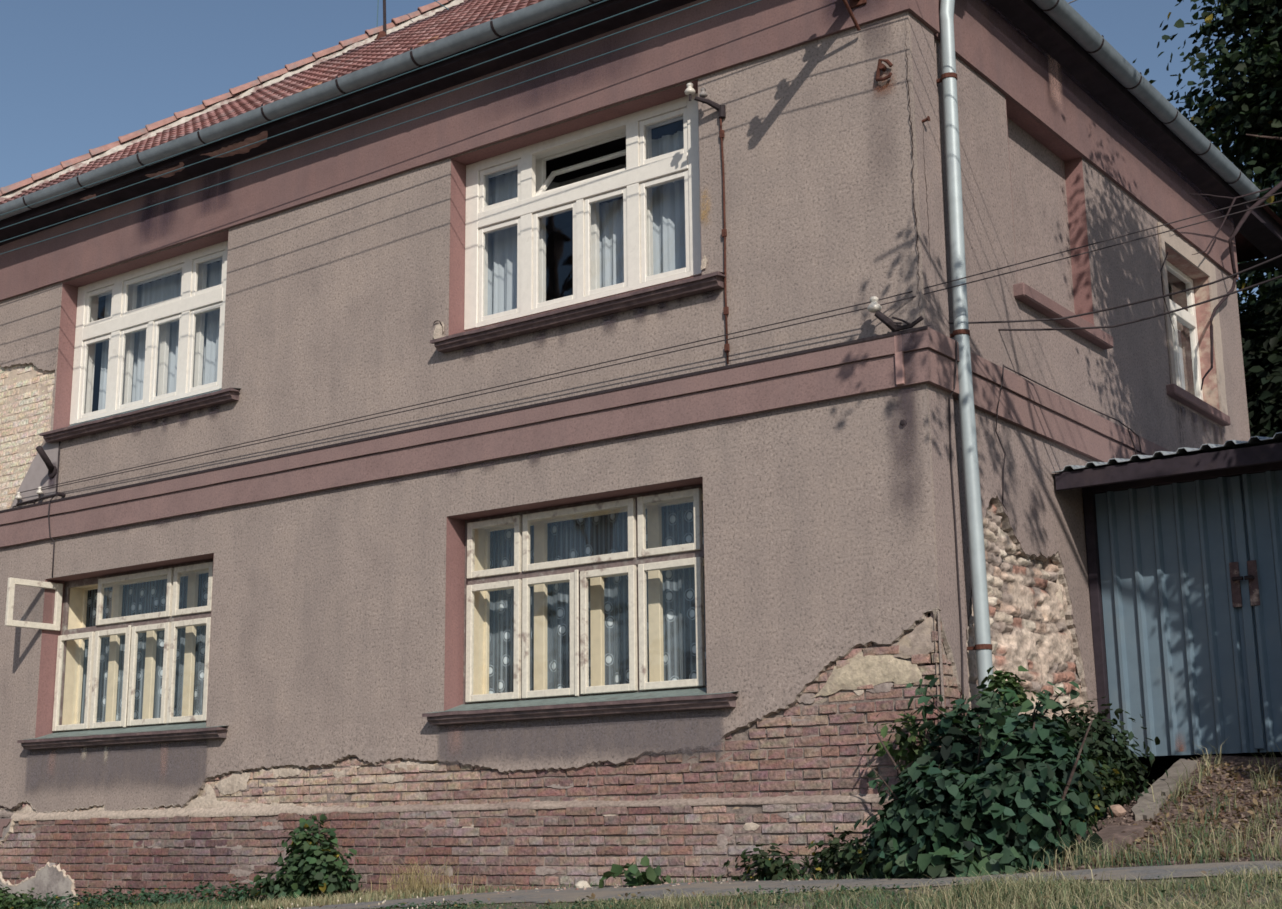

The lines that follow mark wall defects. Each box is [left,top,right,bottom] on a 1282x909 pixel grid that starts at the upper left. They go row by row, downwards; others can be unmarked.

flaking render [0,363,55,510]
flaking render [0,495,1094,909]